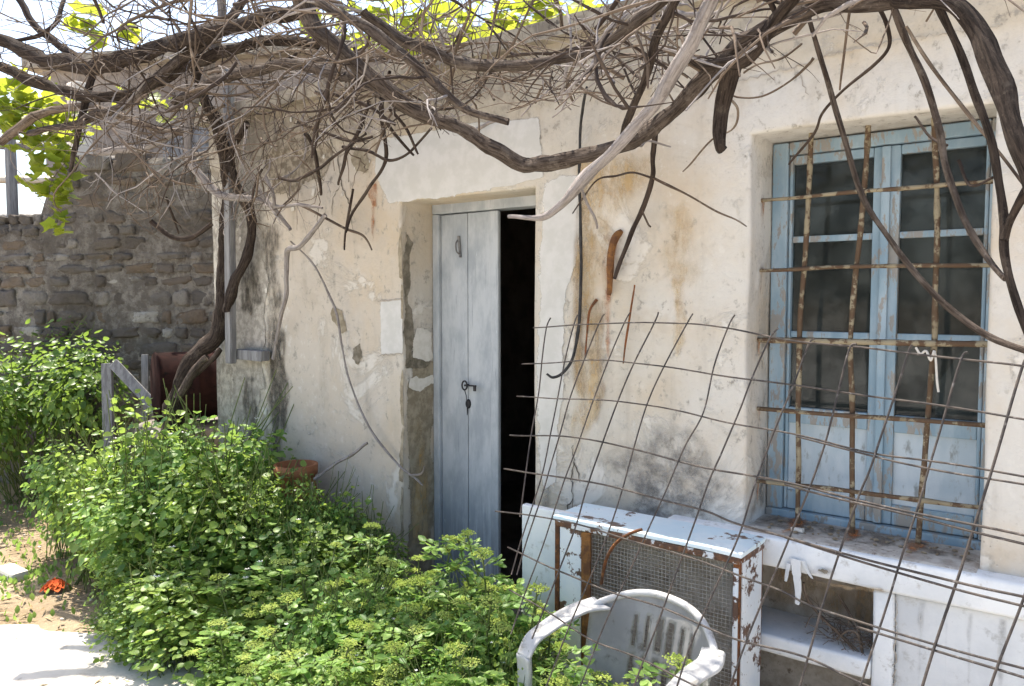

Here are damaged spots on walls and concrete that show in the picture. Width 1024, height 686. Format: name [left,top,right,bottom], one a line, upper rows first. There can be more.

leakage [242,229,288,462]
flaking render [331,308,346,333]
flaking render [352,344,362,365]
flaking render [398,228,434,601]